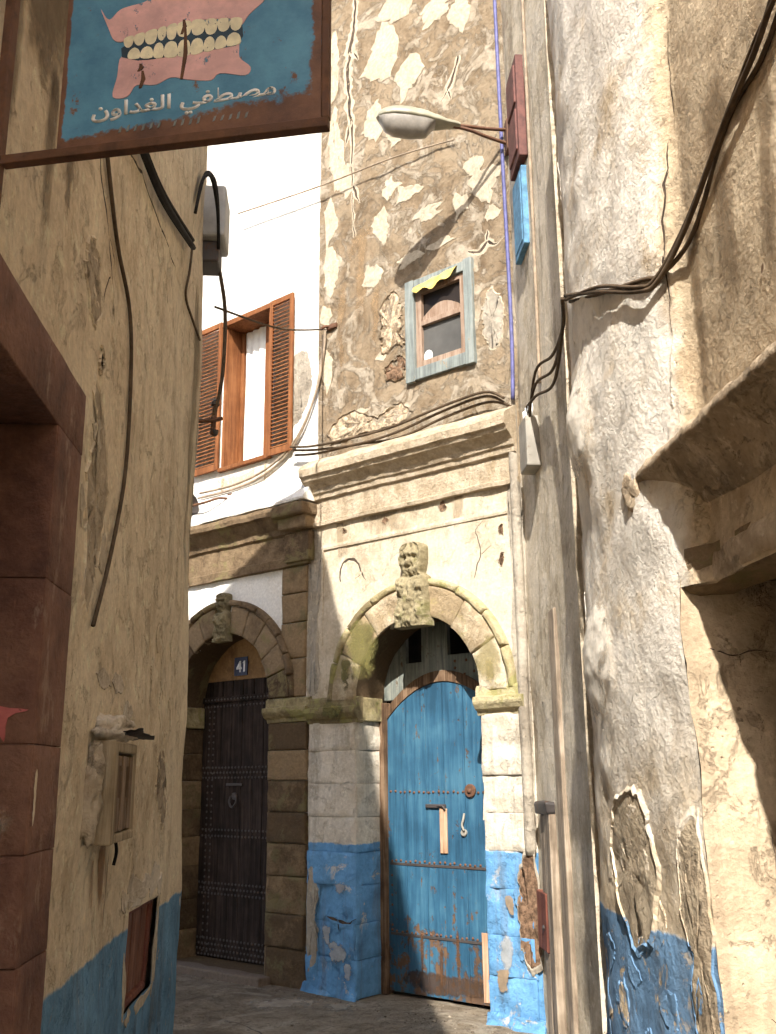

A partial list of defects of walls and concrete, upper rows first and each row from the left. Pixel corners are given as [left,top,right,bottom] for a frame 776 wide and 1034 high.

peeling [359,0,471,104]
peeling [361,99,401,149]
peeling [320,31,352,334]
peeling [371,176,424,246]
peeling [412,155,502,222]
flaking render [375,288,406,382]
crack [473,519,490,579]
crack [708,648,776,676]
rust [404,932,484,997]
flaking render [497,851,544,992]
flaking render [606,784,667,1034]
flaking render [676,806,724,1034]